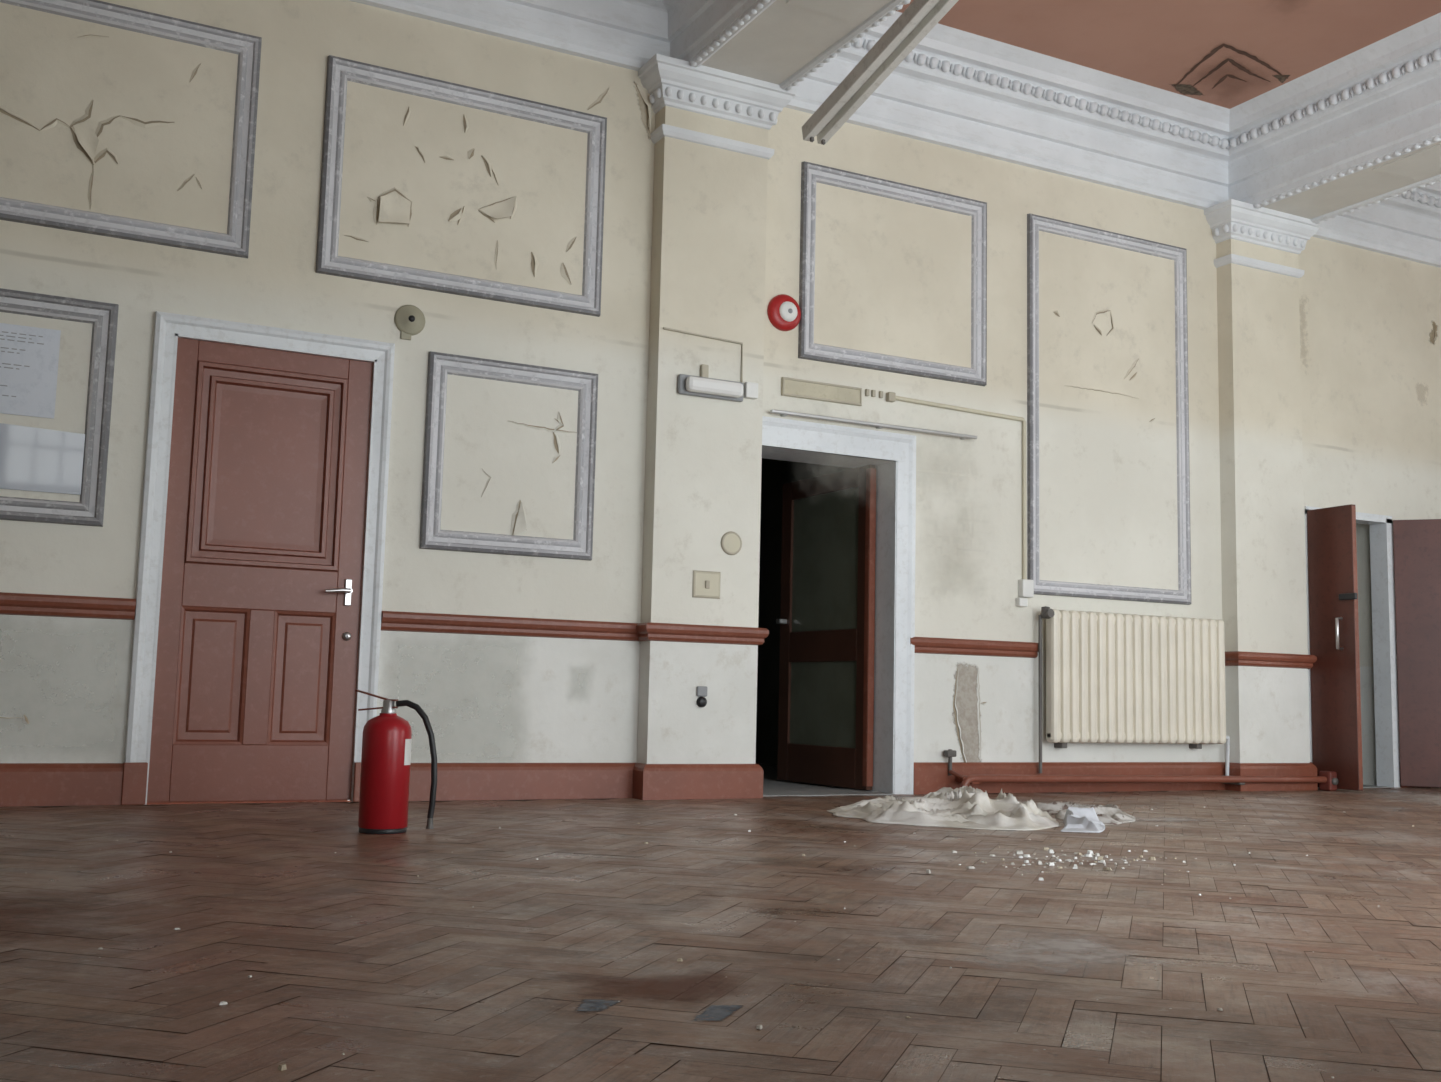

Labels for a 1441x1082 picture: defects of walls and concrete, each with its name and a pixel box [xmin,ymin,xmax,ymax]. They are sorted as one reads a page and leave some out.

crack [189,63,201,82]
crack [0,100,175,209]
crack [177,174,202,191]
flaking render [953,664,986,763]